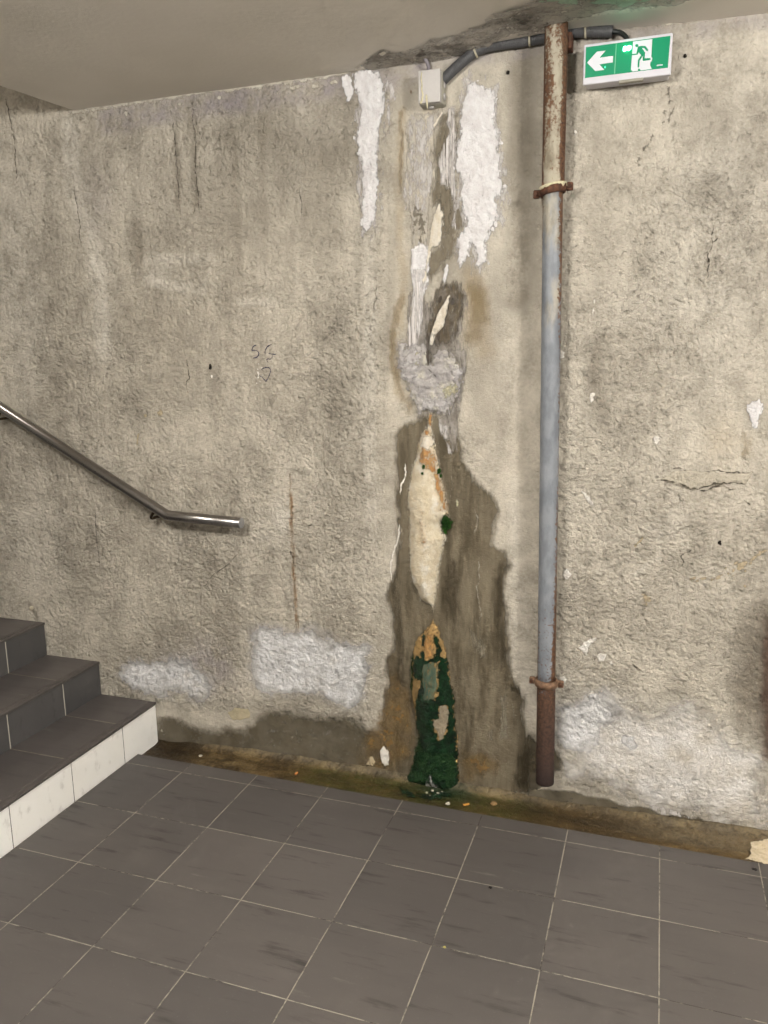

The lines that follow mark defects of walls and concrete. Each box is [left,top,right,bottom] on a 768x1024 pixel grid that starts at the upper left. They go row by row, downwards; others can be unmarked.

spalling [411,201,427,243]
spalling [425,281,465,348]
leakage [157,69,763,827]